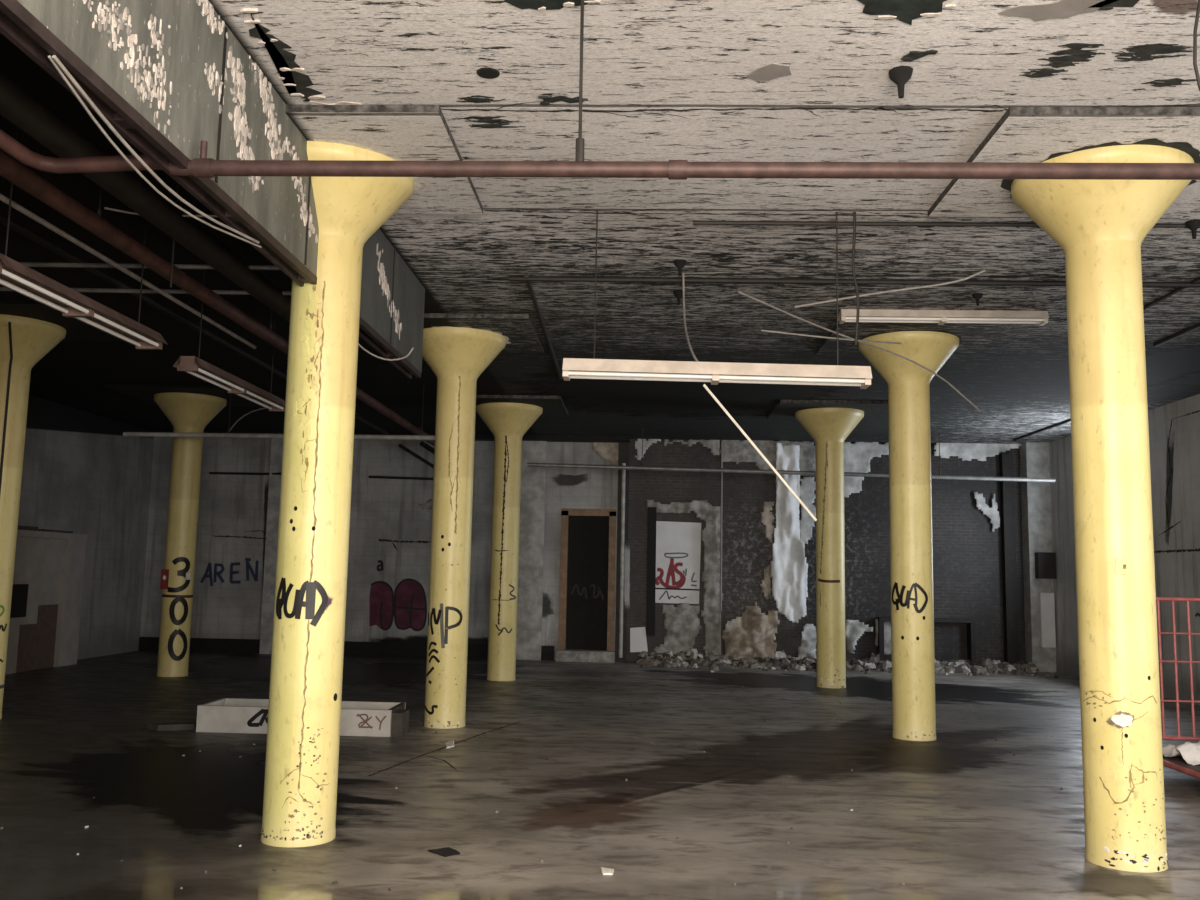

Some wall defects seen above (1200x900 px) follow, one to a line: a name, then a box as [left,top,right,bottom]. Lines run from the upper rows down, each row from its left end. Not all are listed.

spalling [857,0,956,25]
peeling [998,0,1140,21]
spalling [1019,43,1193,78]
spalling [196,0,361,160]
peeling [248,176,264,193]
peeling [292,176,318,243]
spalling [1085,690,1134,728]
crack [1083,691,1157,804]